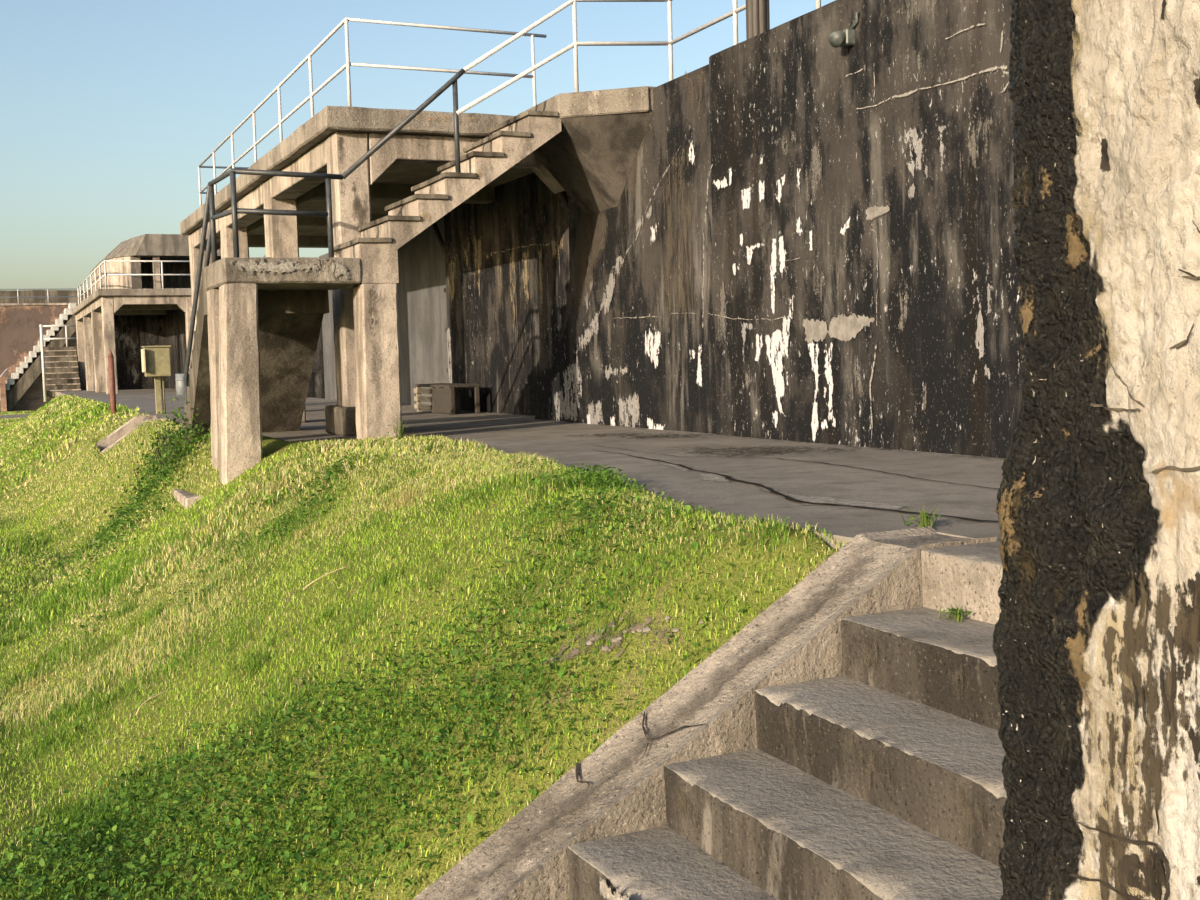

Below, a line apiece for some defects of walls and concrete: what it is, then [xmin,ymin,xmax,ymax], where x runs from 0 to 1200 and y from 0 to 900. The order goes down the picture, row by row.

peeling [714,168,801,209]
water stain [805,144,822,200]
spalling [866,205,890,221]
peeling [1100,139,1110,170]
water stain [0,305,65,378]
water stain [448,235,564,351]
spalling [733,217,875,443]
crack [869,217,878,439]
crack [1169,323,1194,349]
crack [589,444,999,522]
water stain [952,0,1200,900]
crack [1090,361,1200,474]